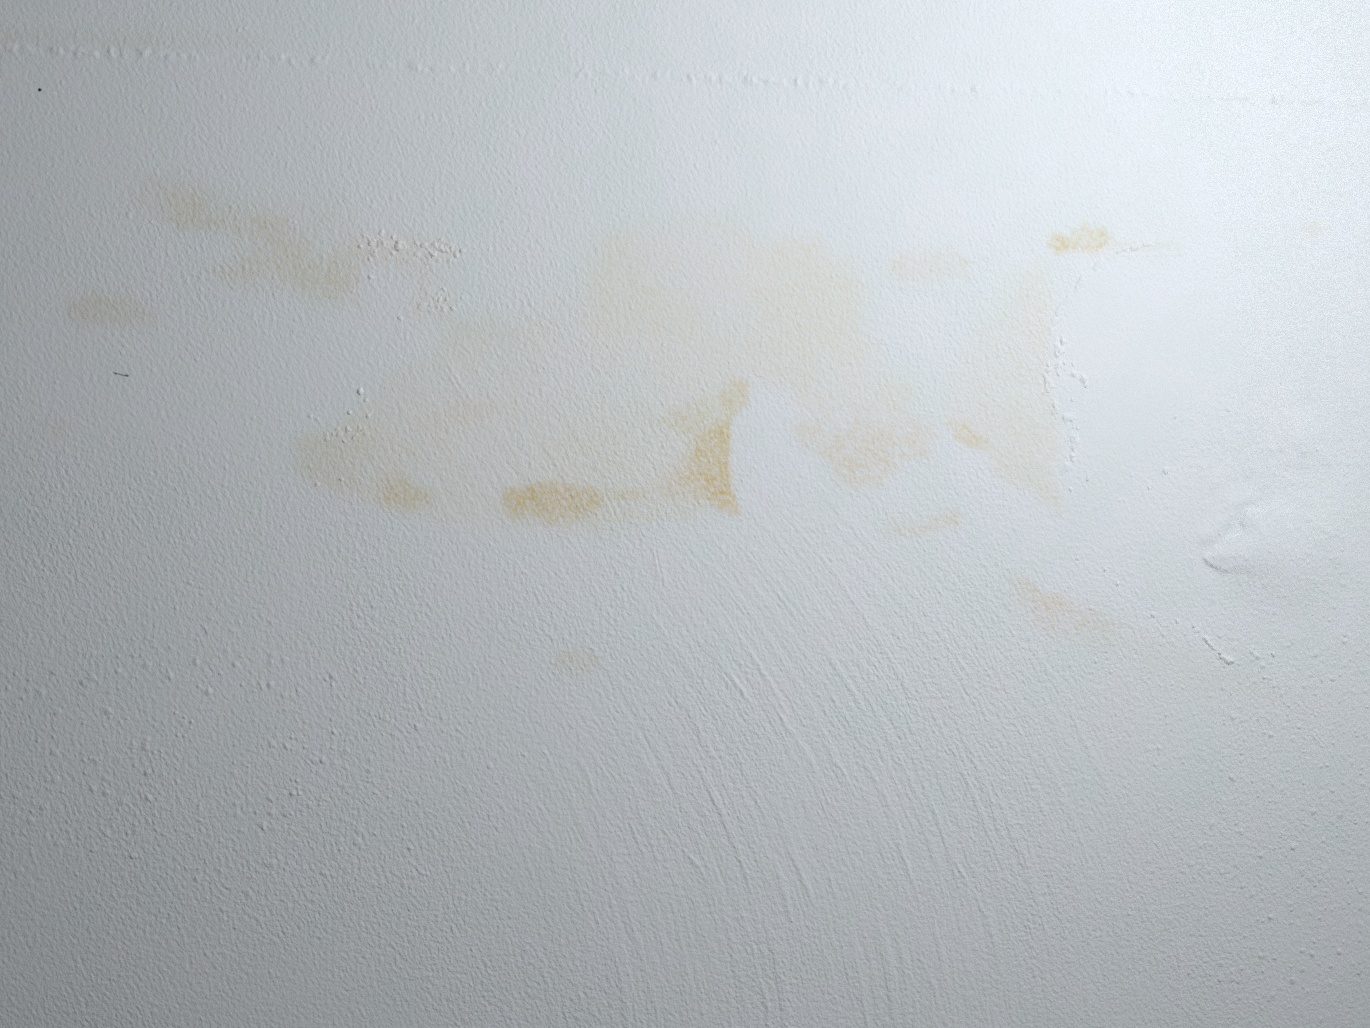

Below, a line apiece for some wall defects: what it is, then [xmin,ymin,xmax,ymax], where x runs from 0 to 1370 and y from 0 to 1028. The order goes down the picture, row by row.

damp [116,159,378,323]
damp [283,199,1185,550]